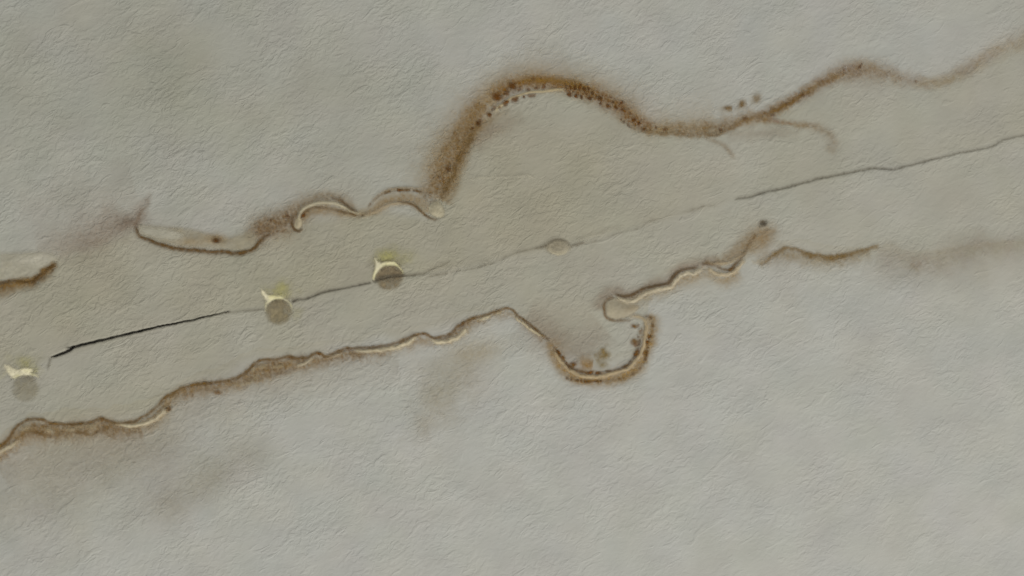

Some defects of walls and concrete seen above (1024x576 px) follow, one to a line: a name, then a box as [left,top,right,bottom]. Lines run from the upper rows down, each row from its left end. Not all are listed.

leakage [753,75,840,125]
leakage [435,74,668,190]
crack [756,159,933,195]
leakage [379,188,432,219]
leakage [121,201,358,255]
leakage [773,246,877,260]
crack [293,274,407,302]
leakage [603,228,768,321]
crack [52,315,212,357]
spalling [6,366,32,378]
leakage [0,308,655,459]